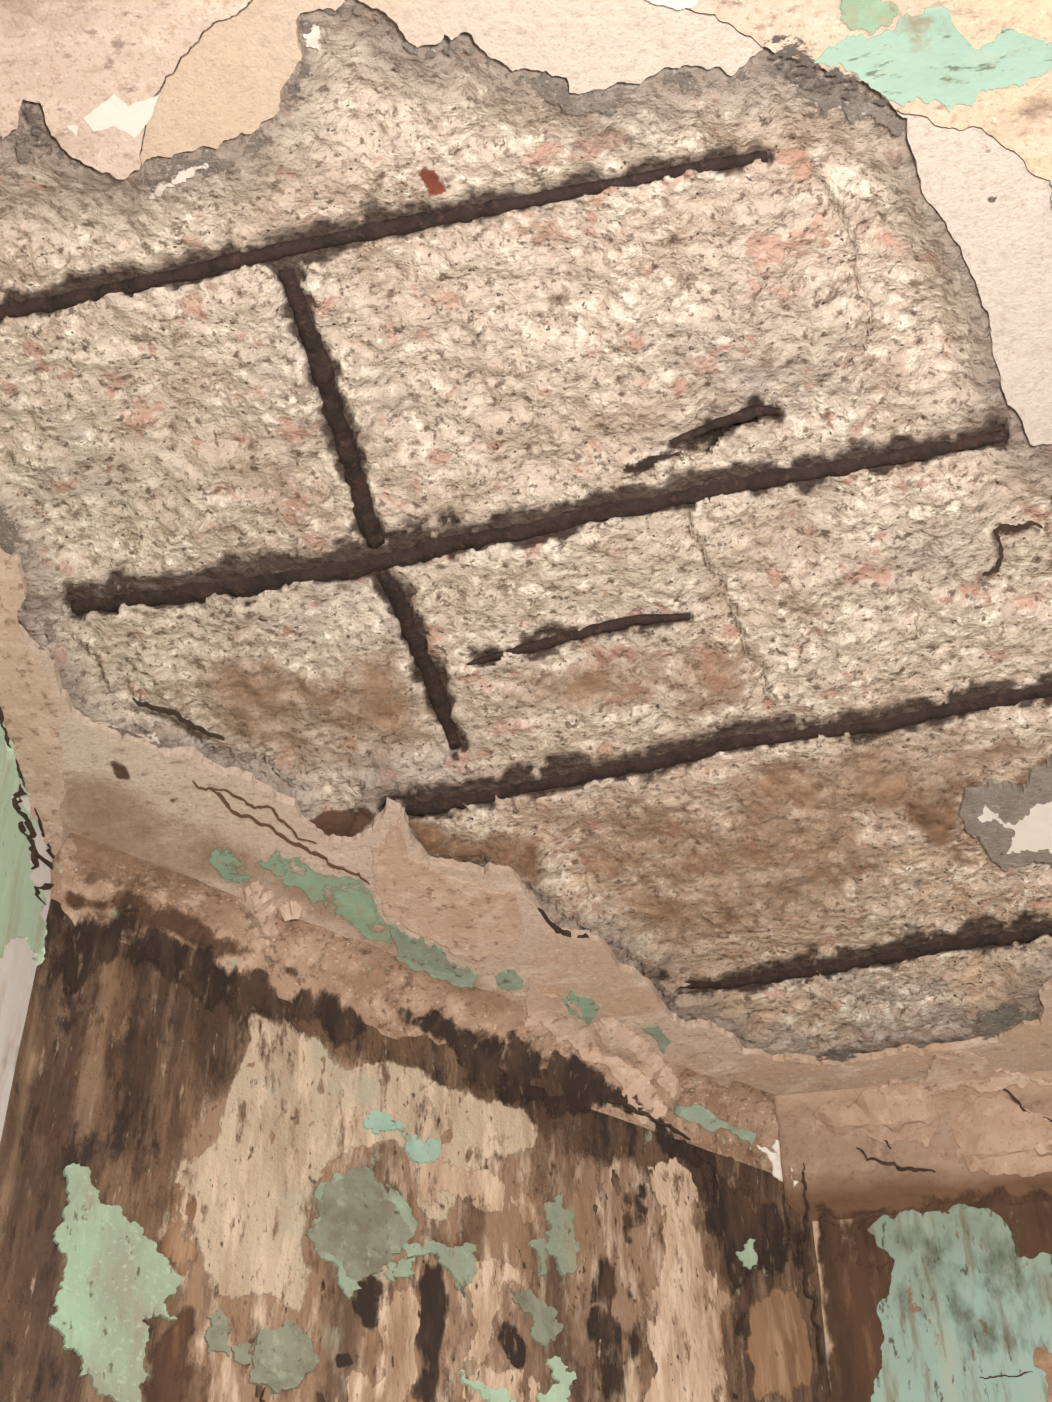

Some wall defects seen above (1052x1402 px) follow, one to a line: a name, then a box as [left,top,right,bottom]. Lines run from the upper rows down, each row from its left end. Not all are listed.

rust [419,168,446,195]
rust [623,414,781,476]
spalling [0,0,1052,1101]
crack [132,697,225,741]
crack [192,781,370,885]
rust [310,806,375,837]
damp [51,890,364,1048]
crack [856,1140,935,1173]
flaking render [48,1013,813,1402]
damp [352,1275,383,1329]
peeling [868,1203,1052,1402]
damp [144,1308,194,1402]